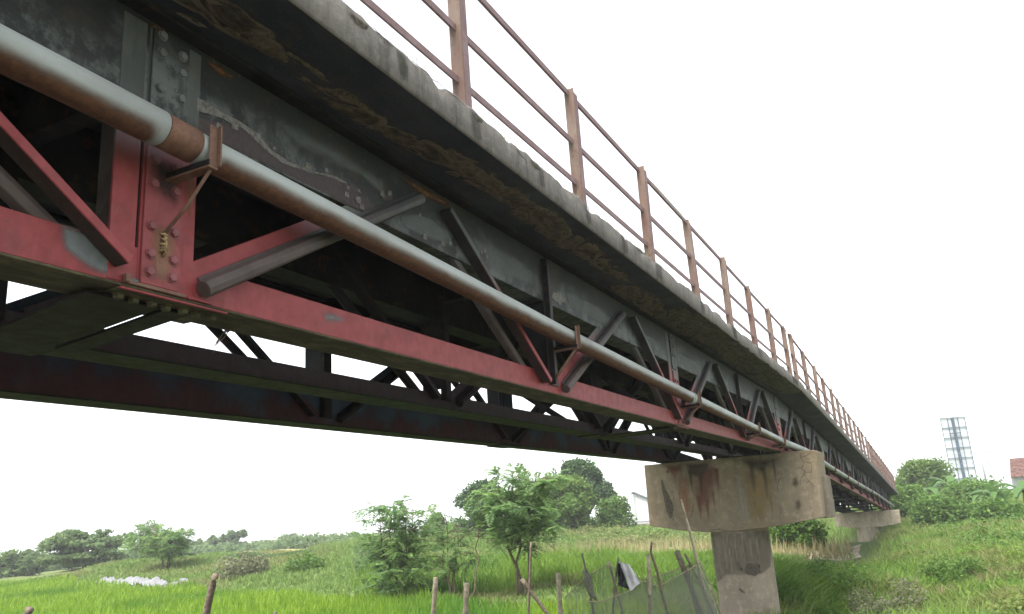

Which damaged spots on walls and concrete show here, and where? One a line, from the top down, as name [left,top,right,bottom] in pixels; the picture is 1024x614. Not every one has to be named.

peeling [63,228,108,273]
spalling [172,0,801,394]